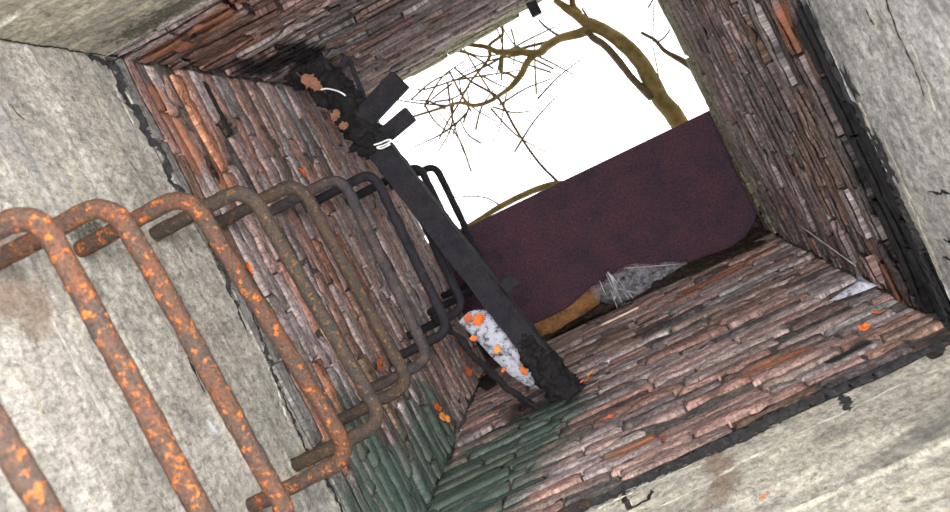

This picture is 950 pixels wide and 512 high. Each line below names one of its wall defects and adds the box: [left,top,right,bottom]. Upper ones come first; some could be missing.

crack [0,0,222,212]
crack [208,243,343,512]
crack [567,0,950,512]